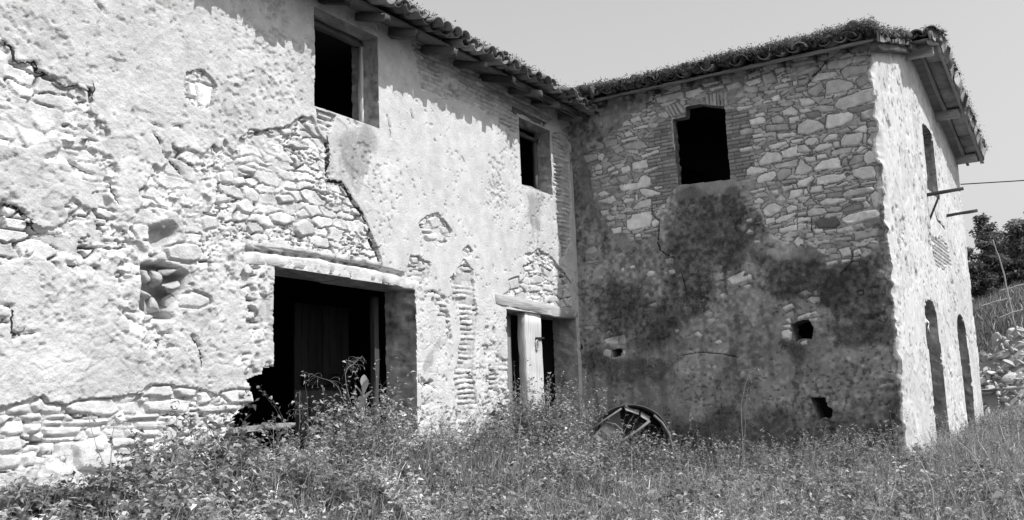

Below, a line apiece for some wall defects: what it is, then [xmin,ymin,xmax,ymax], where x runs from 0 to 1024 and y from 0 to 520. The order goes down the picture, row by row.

crack [1,39,95,102]
peeling [0,37,111,148]
peeling [182,68,217,109]
peeling [0,205,43,265]
peeling [200,109,382,270]
peeling [410,39,572,308]
peeling [450,246,477,450]
peeling [0,385,251,474]